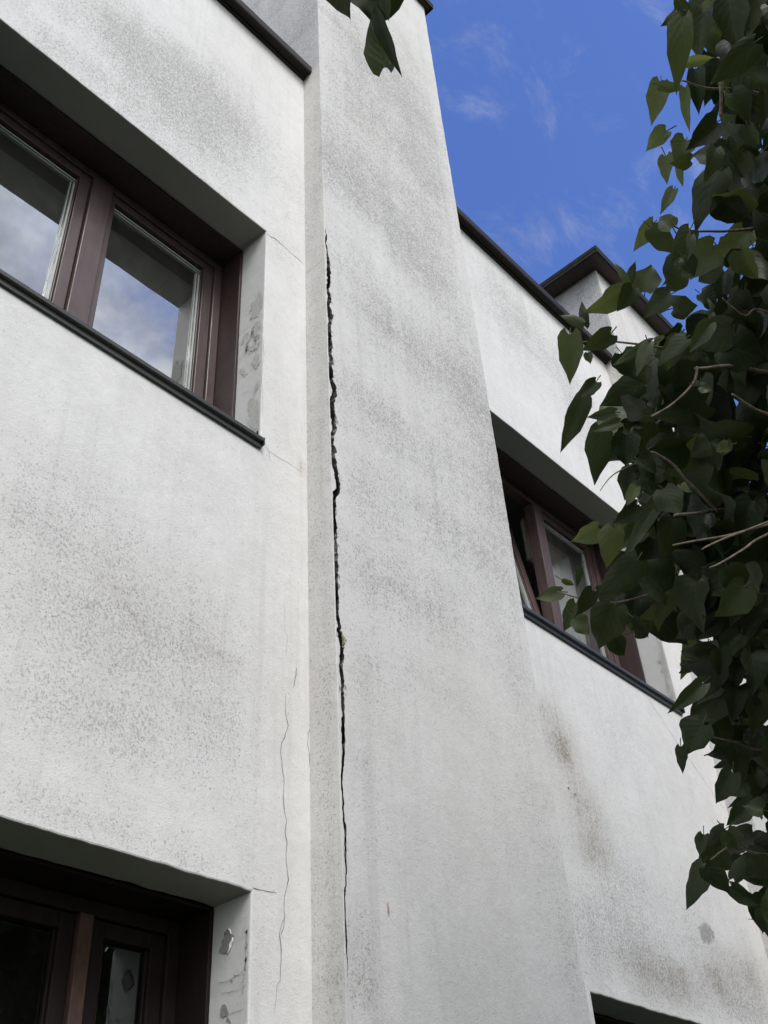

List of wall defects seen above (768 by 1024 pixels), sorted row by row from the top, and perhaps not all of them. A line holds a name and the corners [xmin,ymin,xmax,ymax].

peeling [239,291,262,434]
crack [243,199,389,1014]
peeling [219,921,247,992]